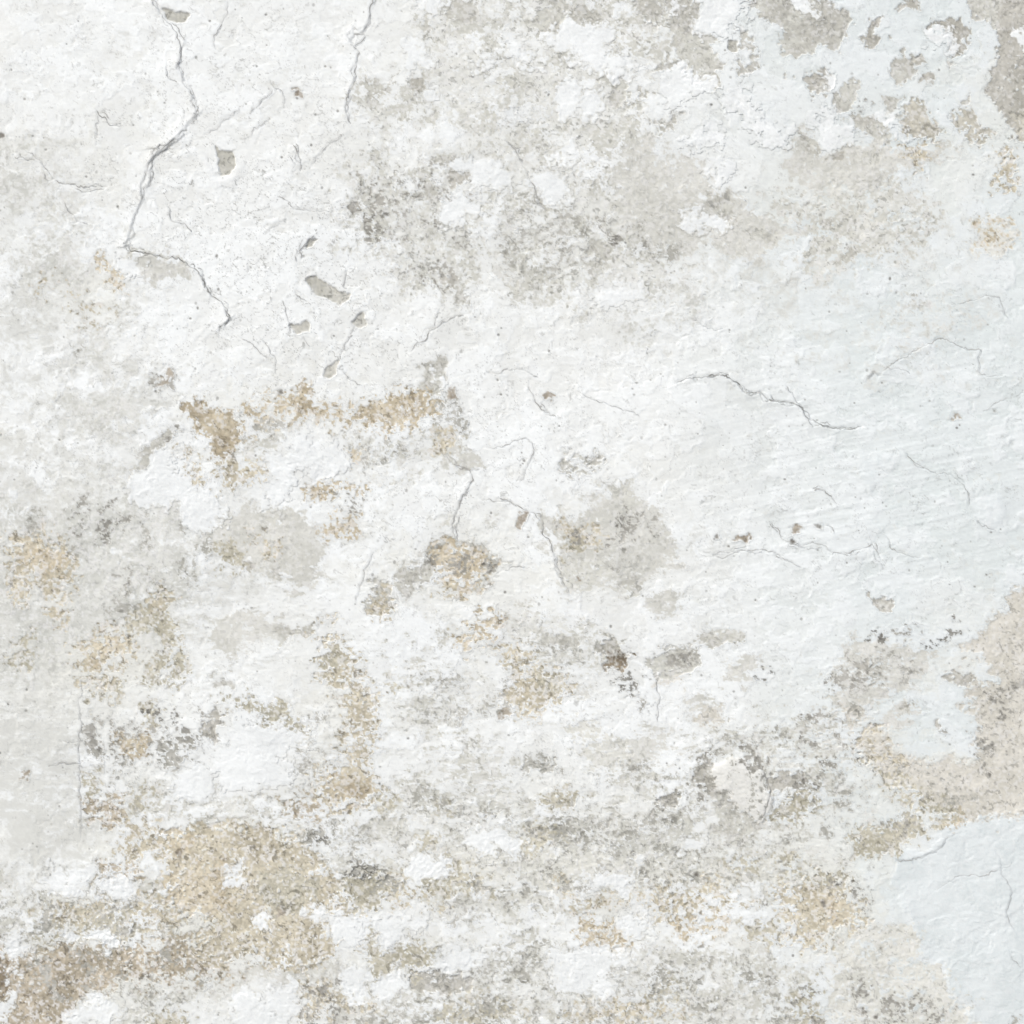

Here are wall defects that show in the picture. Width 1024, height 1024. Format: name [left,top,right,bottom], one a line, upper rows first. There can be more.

crack [290,0,376,169]
crack [125,0,308,373]
peeling [214,145,237,177]
peeling [304,0,1024,329]
crack [676,372,861,430]
crack [437,437,573,588]
water stain [589,631,655,714]
water stain [816,585,970,701]
water stain [422,733,567,792]
water stain [710,707,936,866]
water stain [296,973,379,1024]
water stain [664,949,835,1024]